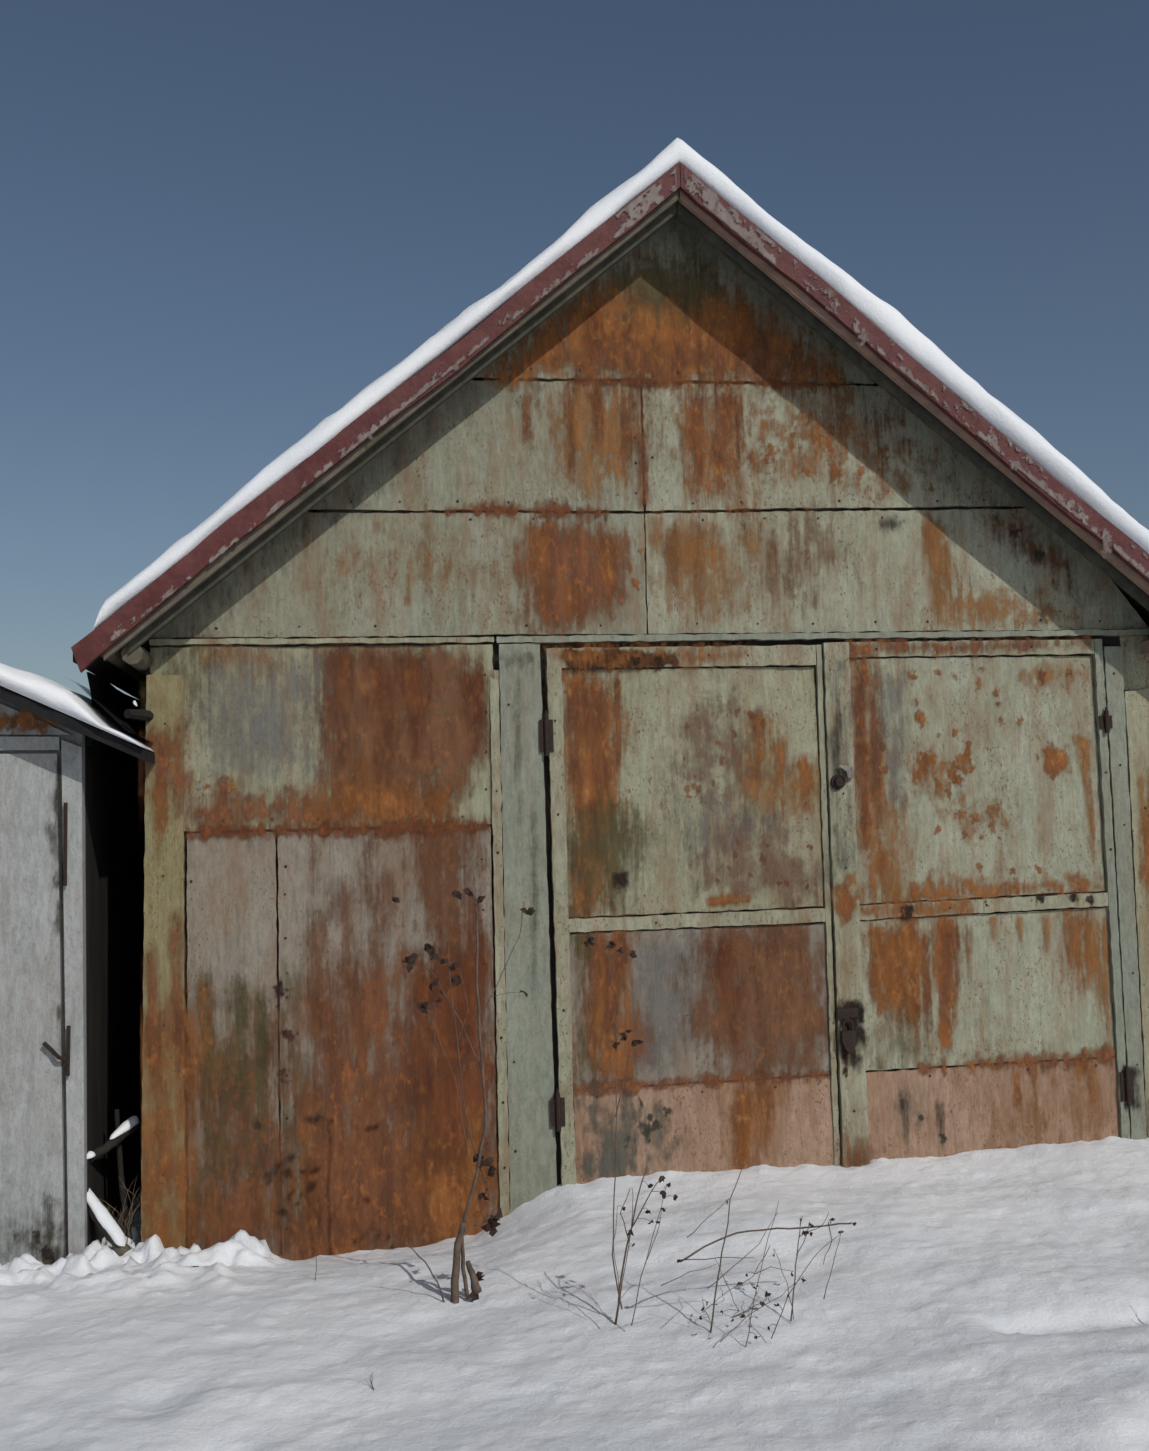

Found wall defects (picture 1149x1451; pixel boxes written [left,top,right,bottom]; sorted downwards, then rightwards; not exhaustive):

peeling [614,169,840,313]
peeling [110,576,191,641]
peeling [209,500,284,563]
peeling [302,248,599,488]
rust [445,254,1139,1170]
peeling [853,318,1149,578]
rust [139,643,499,1261]
rust [1139,779,1149,888]